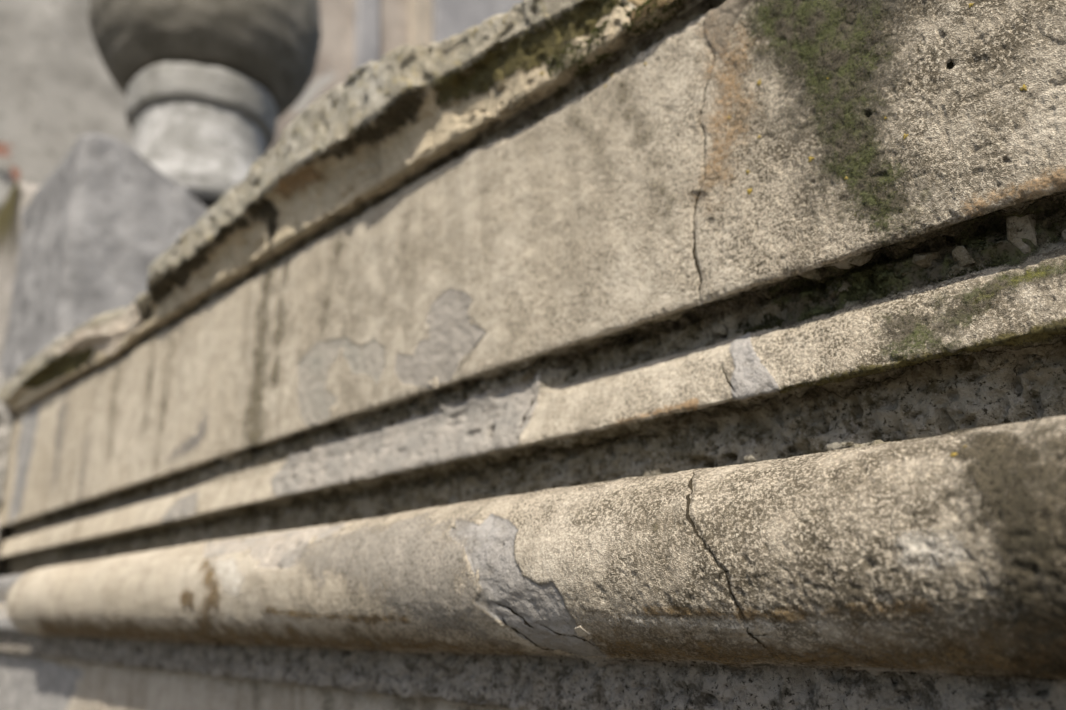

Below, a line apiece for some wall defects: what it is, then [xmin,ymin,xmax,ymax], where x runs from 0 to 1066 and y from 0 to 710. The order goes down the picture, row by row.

leakage [291,71,335,114]
leakage [304,87,427,166]
crack [692,50,719,301]
leakage [460,0,1066,401]
leakage [43,198,444,523]
peeling [297,288,486,427]
leakage [64,260,1066,555]
spalling [449,514,607,658]
crack [686,472,773,654]
leakage [593,420,1066,680]